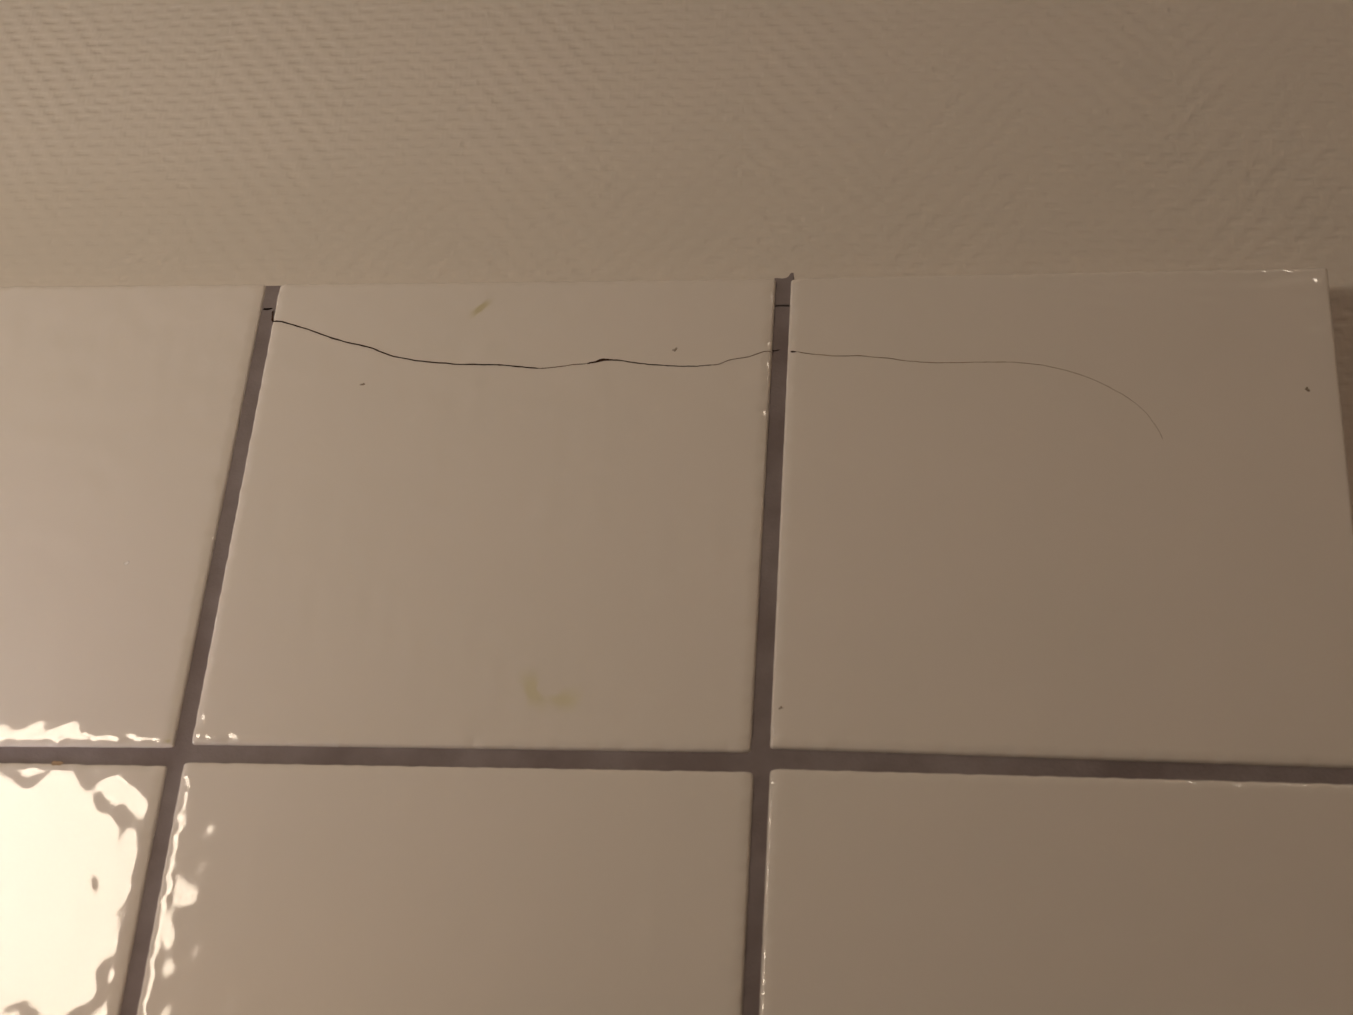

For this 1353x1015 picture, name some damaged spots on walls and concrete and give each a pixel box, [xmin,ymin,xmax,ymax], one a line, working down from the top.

crack [263,308,1163,439]